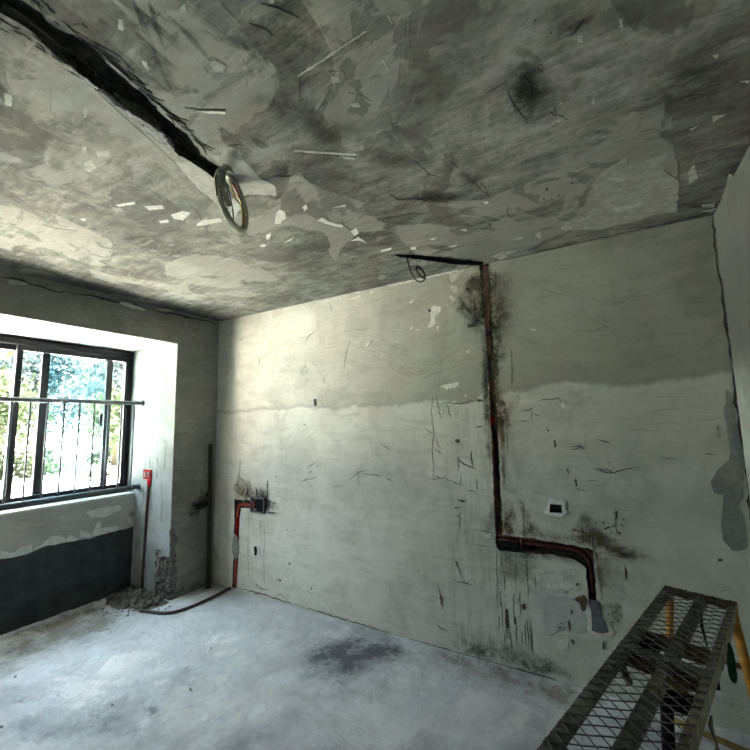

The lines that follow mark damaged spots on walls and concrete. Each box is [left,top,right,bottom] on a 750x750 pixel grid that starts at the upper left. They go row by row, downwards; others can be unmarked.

crack [51,50,177,165]
crack [185,107,243,146]
damp [487,69,545,123]
crack [0,276,216,324]
damp [458,277,488,326]
crack [505,211,750,516]
damp [255,481,274,514]
crack [426,398,543,595]
peeling [0,505,122,559]
spalling [154,549,178,600]
damp [497,567,533,649]
damp [310,638,402,675]